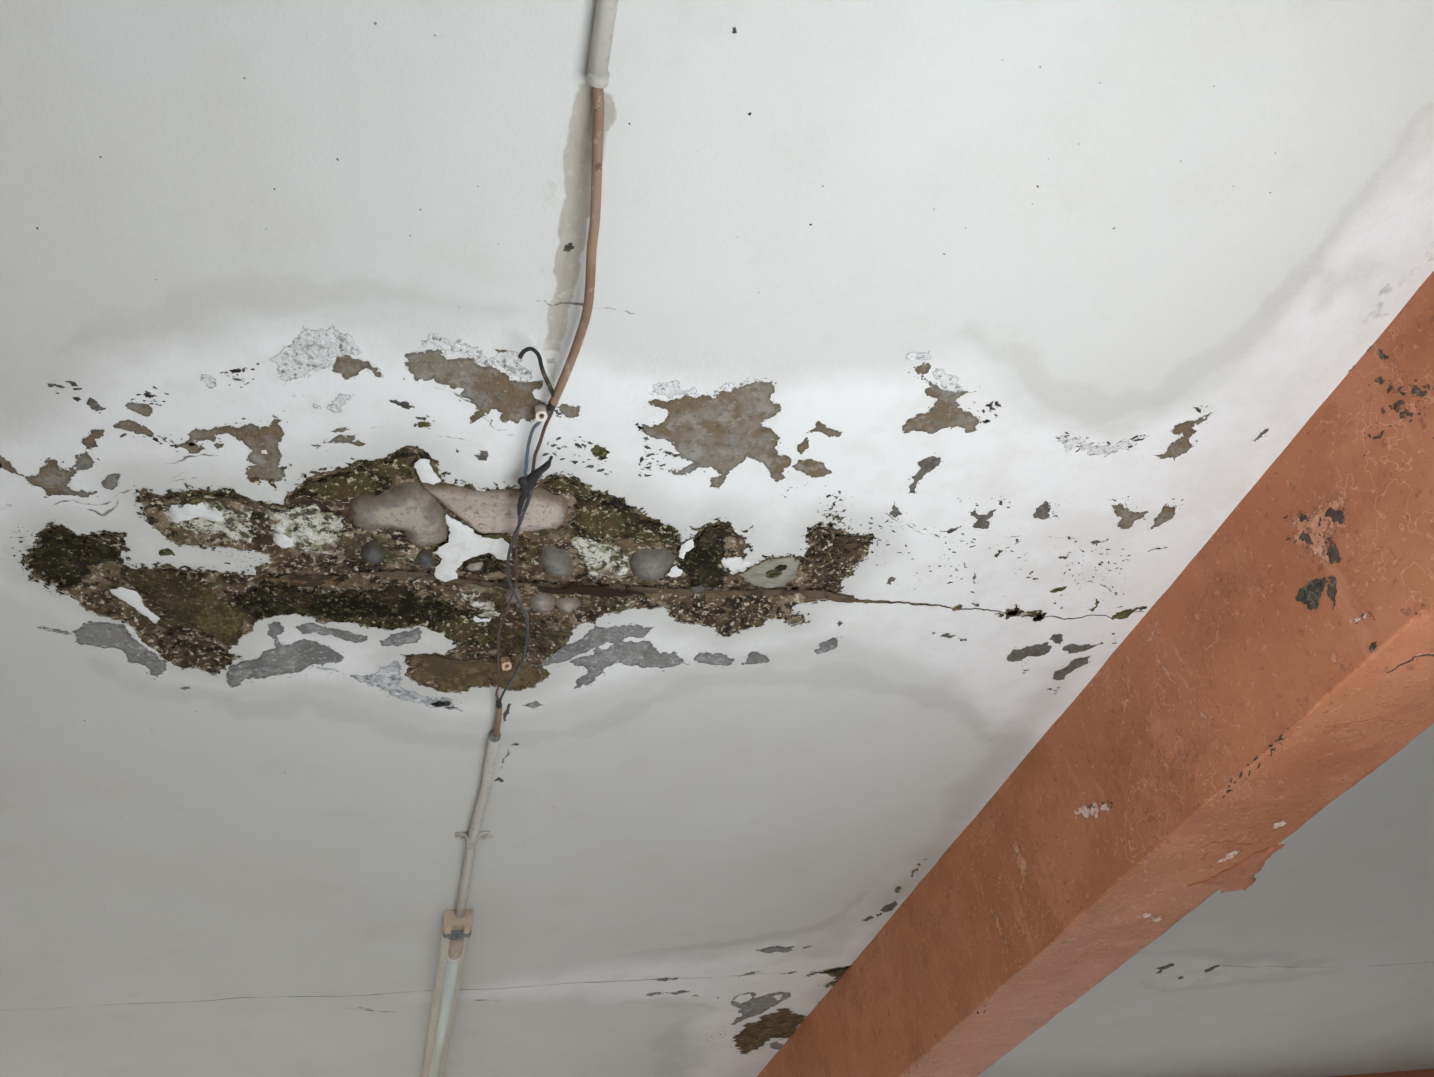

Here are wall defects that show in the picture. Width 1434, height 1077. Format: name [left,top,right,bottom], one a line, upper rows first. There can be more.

flaking render [403,71,618,424]
flaking render [1364,349,1434,440]
water stain [0,120,1434,752]
peeling [1056,432,1146,456]
peeling [1155,405,1213,461]
spalling [0,325,1038,712]
peeling [1033,501,1059,520]
peeling [1050,496,1184,613]
crack [831,598,1147,622]
peeling [1007,633,1117,694]
peeling [706,992,791,1045]